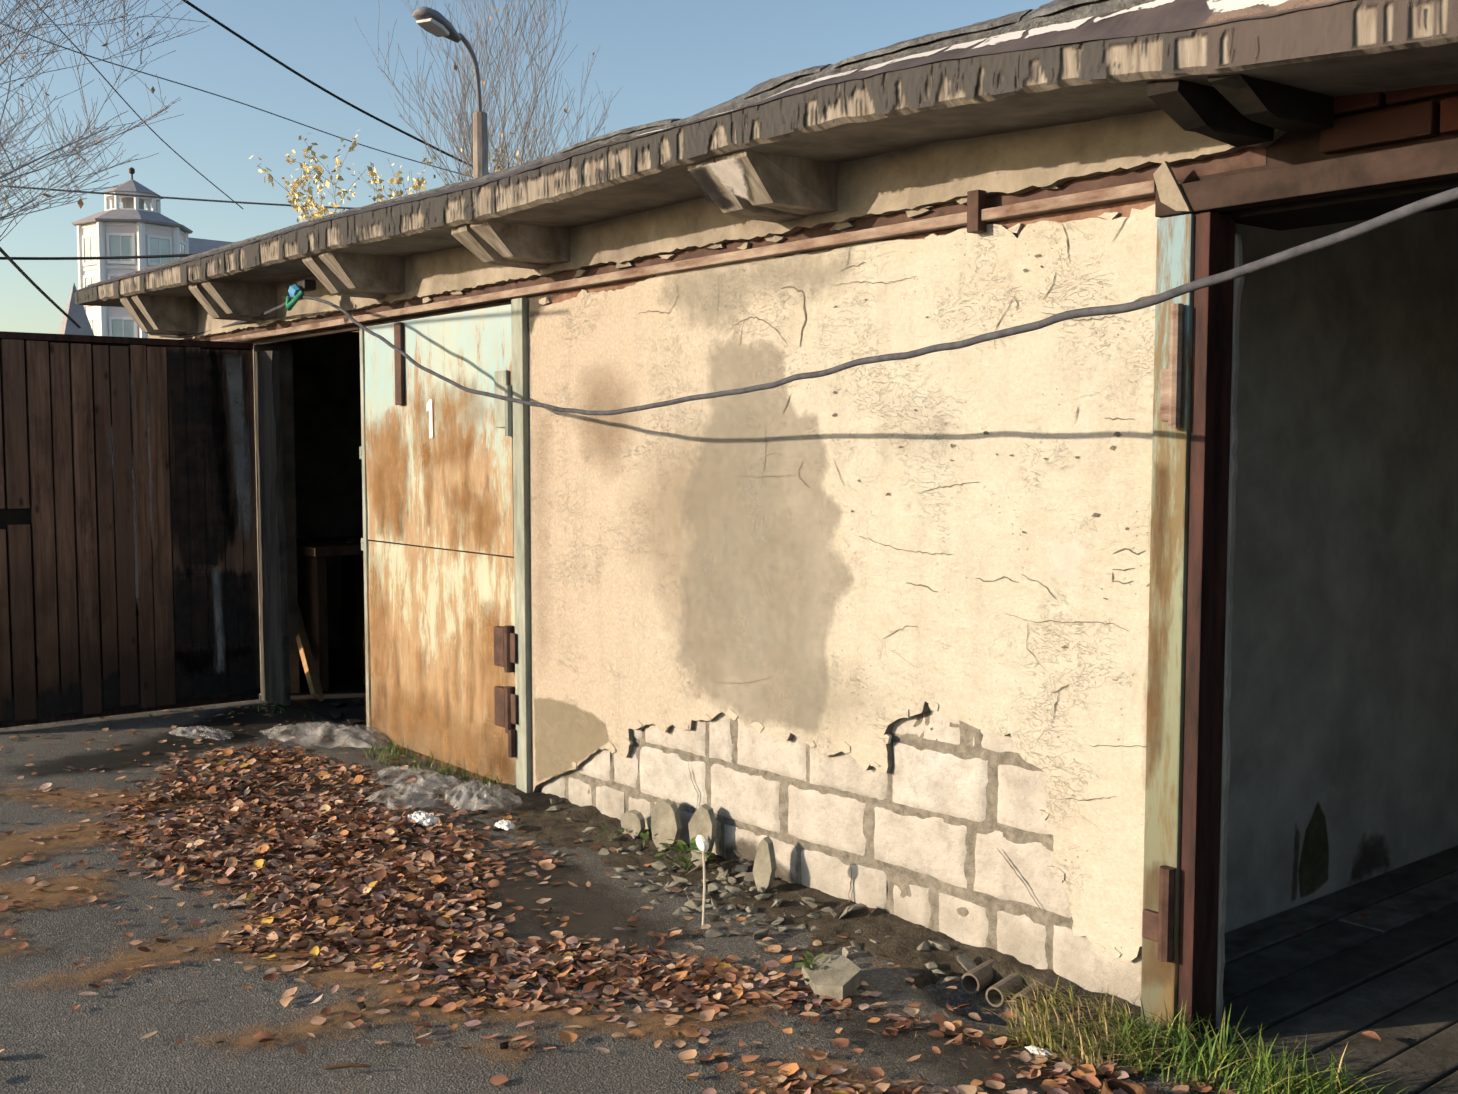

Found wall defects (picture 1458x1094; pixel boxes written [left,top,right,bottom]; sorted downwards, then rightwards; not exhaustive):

peeling [686,0,1174,123]
flaking render [987,147,1266,236]
flaking render [187,197,967,341]
crack [716,247,916,345]
crack [994,224,1154,344]
rust [371,391,473,534]
damp [686,349,839,728]
crack [859,536,1129,720]
crack [1112,548,1150,586]
rust [1155,471,1165,557]
rust [1147,651,1160,748]
flaking render [540,702,1142,1007]